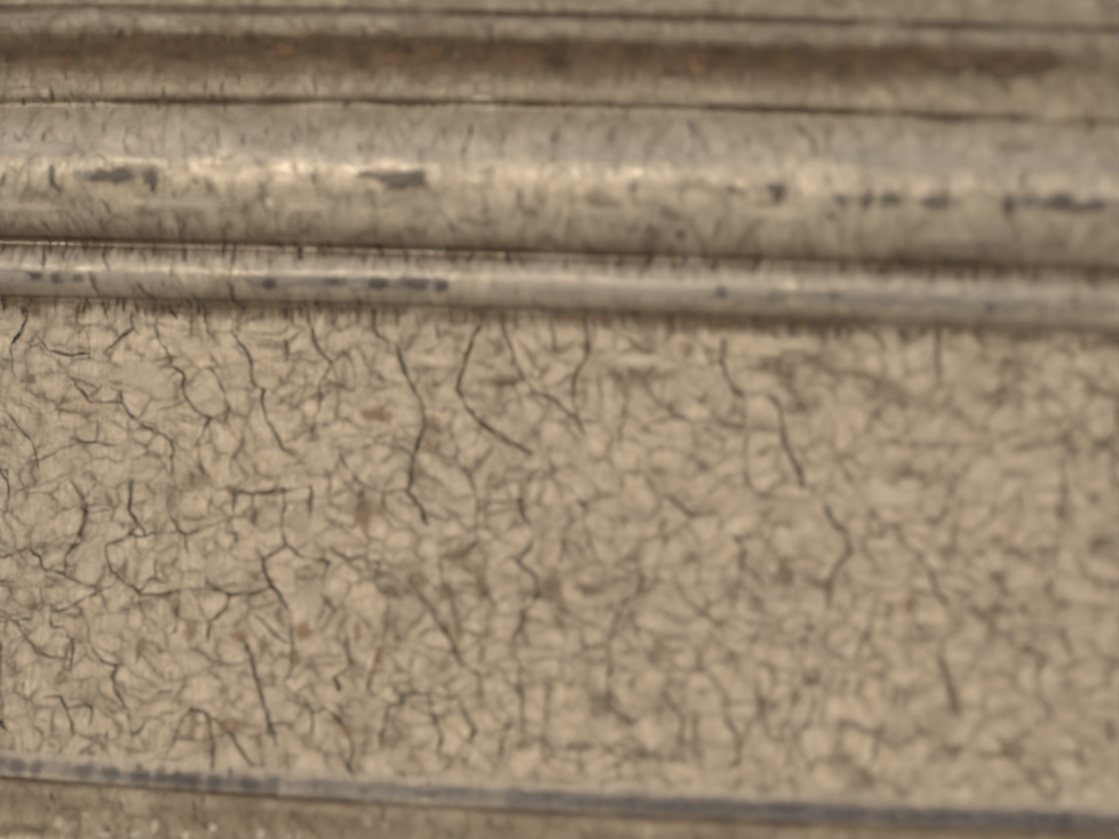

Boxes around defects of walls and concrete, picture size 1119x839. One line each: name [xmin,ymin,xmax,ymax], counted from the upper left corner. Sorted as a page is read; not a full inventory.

crack [0,154,1050,785]
crack [1061,408,1119,498]